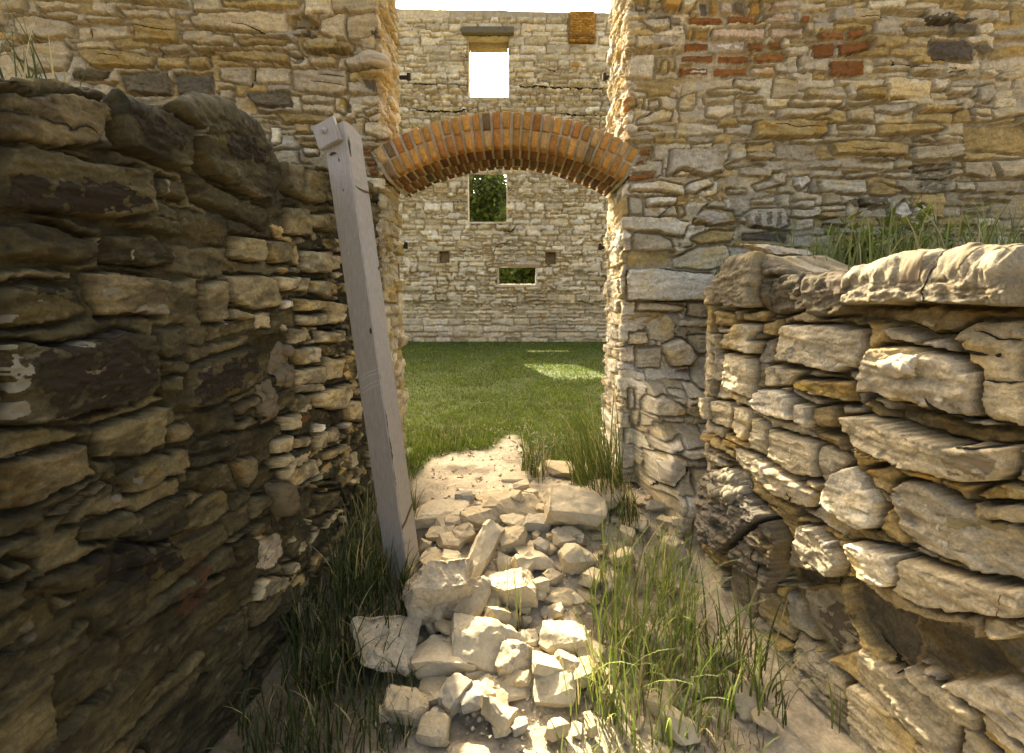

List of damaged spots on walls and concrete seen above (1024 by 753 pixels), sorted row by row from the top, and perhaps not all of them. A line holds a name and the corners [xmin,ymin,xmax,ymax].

crack [406,83,472,113]
crack [514,64,607,116]